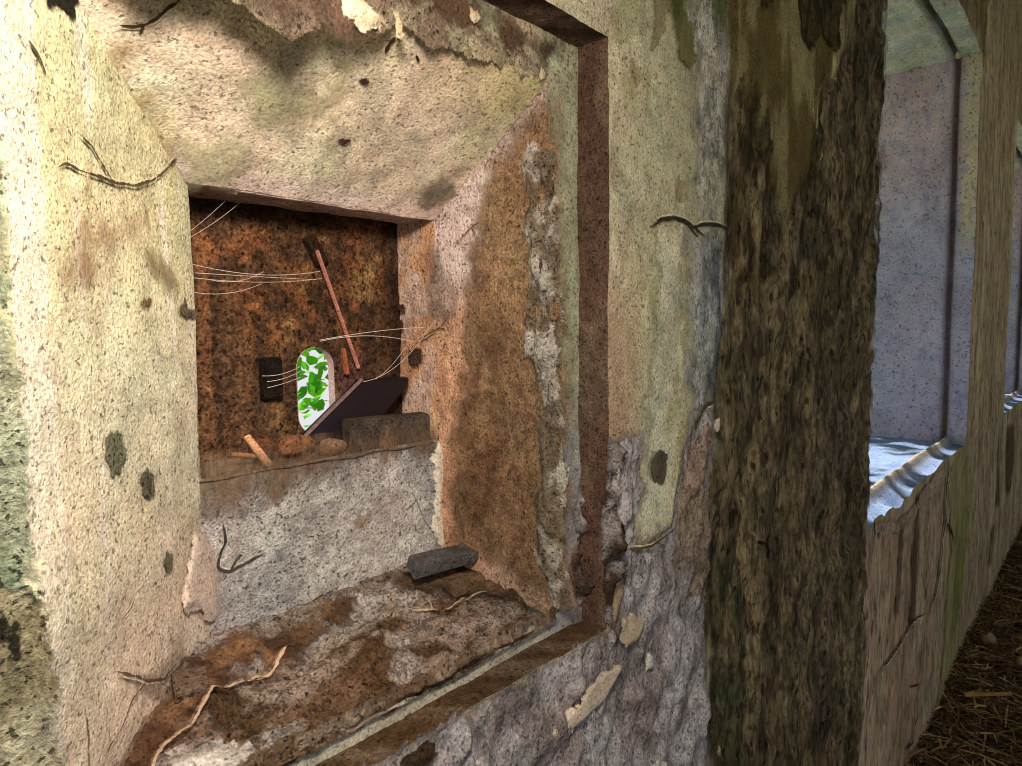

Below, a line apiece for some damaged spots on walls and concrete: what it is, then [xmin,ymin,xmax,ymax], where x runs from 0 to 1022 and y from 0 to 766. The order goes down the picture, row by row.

spalling [47,0,80,19]
crack [120,0,184,34]
spalling [232,0,548,80]
crack [59,134,177,187]
crack [649,214,728,237]
spalling [179,297,197,318]
spalling [362,0,888,766]
peeling [105,430,127,477]
spalling [237,138,572,766]
peeling [139,467,156,499]
spalling [0,259,65,766]
peeling [163,551,173,577]